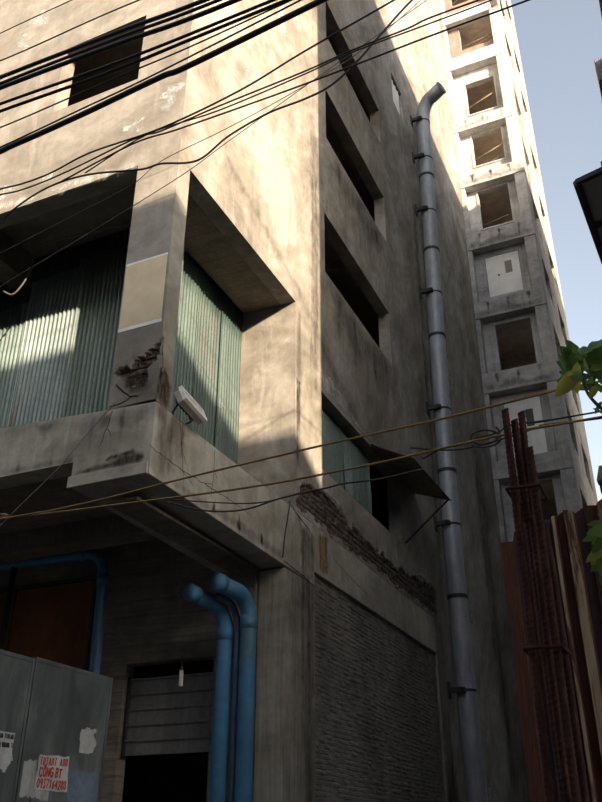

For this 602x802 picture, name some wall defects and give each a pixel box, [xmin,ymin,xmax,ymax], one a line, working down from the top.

spalling [108,328,164,409]
water stain [83,450,143,472]
crack [149,416,249,514]
spalling [294,453,442,624]